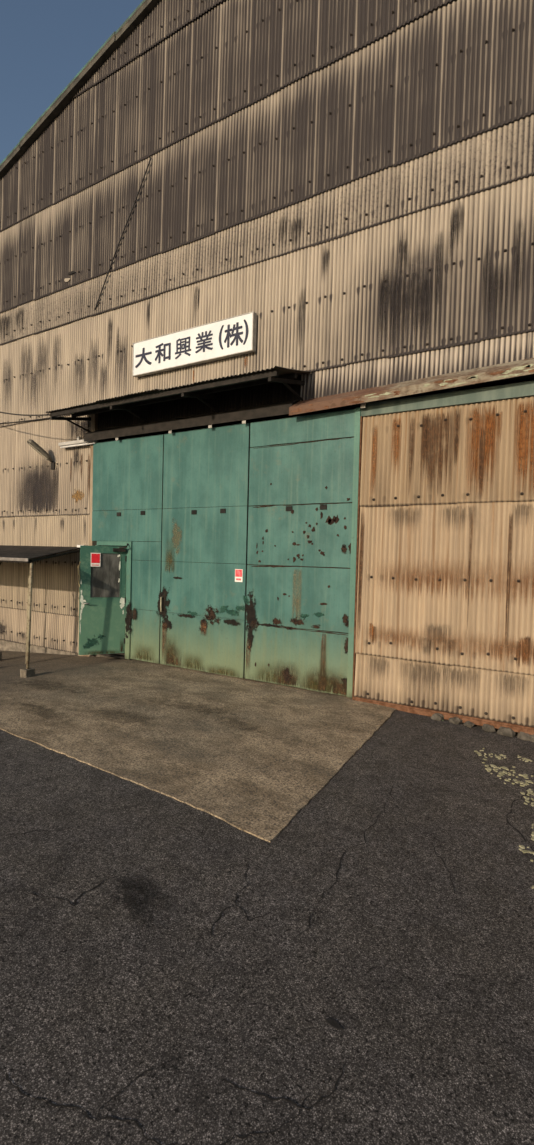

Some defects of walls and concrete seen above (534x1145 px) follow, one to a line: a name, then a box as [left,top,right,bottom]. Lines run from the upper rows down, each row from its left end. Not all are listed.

damp [379,207,463,331]
damp [483,235,534,309]
damp [0,310,24,334]
damp [6,352,59,394]
damp [76,322,125,388]
damp [20,469,58,511]
rust [392,410,502,490]
rust [517,404,534,487]
rust [341,515,376,654]
rust [505,517,530,662]
rust [259,573,347,695]